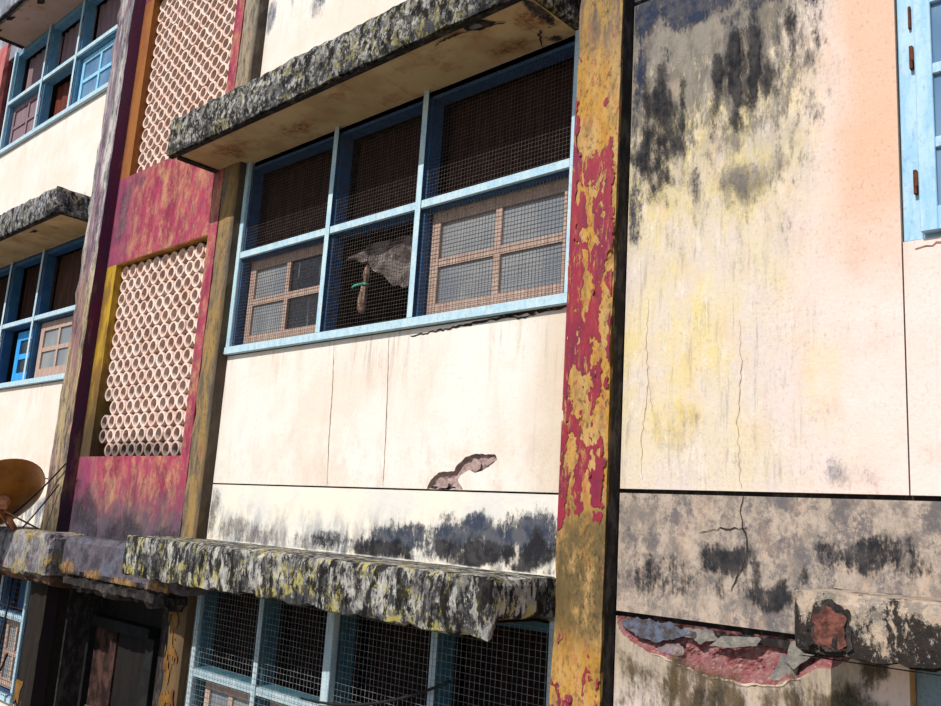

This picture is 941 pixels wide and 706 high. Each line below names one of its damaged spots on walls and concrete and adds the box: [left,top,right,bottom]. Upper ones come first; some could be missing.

leakage [629,0,823,242]
peeling [557,100,616,530]
spalling [427,454,497,490]
crack [699,331,748,591]
leakage [295,535,414,560]
leakage [435,525,556,574]
leakage [618,543,808,613]
leakage [815,535,931,581]
spalling [63,574,188,706]
peeling [550,654,598,706]
leakage [618,650,747,706]
spalling [617,599,853,687]